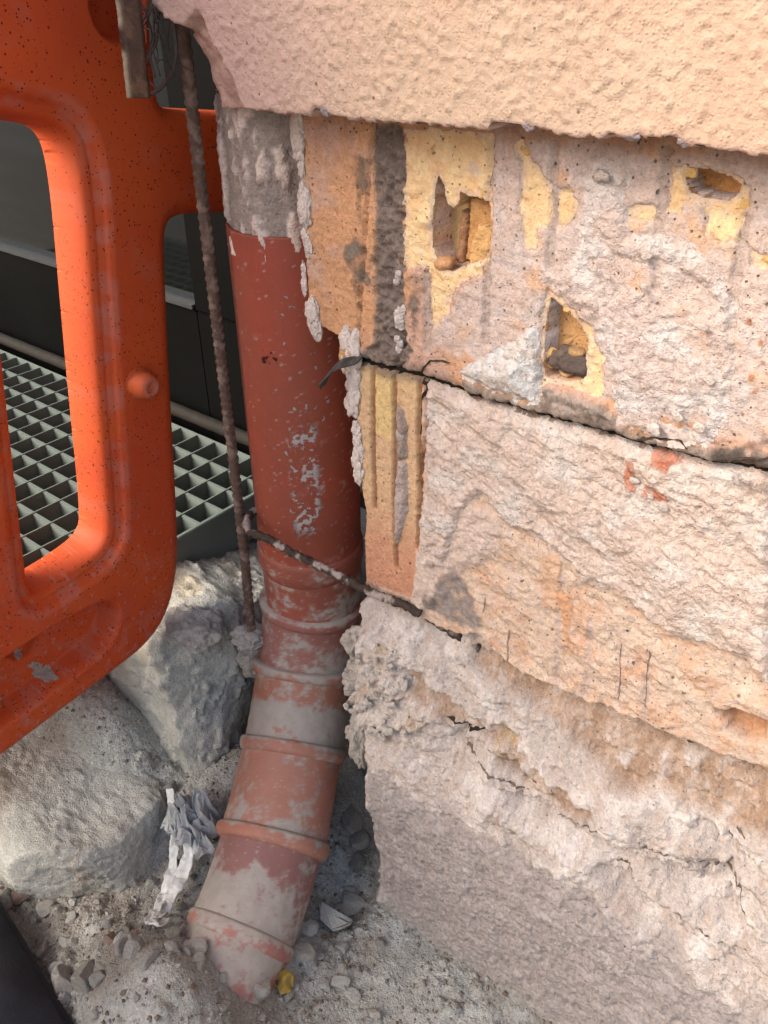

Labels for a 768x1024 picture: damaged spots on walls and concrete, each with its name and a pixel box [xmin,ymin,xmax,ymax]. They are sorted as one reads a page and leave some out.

peeling [290,114,320,332]
spalling [395,121,579,327]
spalling [628,164,752,243]
peeling [338,325,362,405]
peeling [393,304,407,348]
spalling [540,288,606,398]
peeling [351,420,365,479]
crack [362,357,768,472]
peeling [540,553,573,648]
spalling [343,644,427,742]
crack [447,716,536,790]
crack [617,826,745,914]